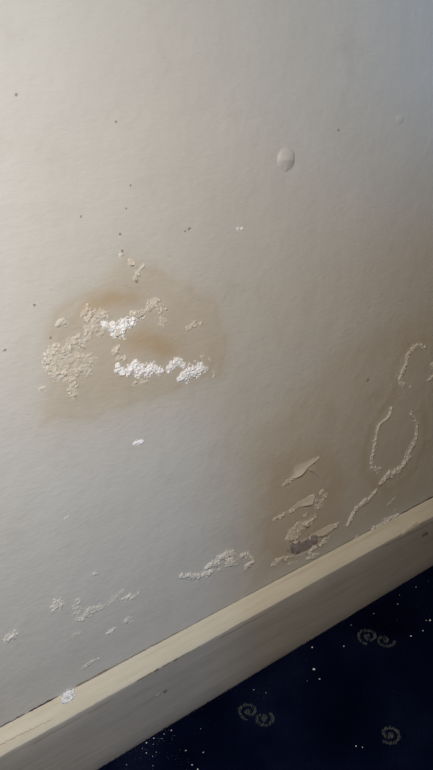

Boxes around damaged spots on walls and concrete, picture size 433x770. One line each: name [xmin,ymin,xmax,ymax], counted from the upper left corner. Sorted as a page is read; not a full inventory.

peeling [39,297,216,401]
peeling [271,406,419,566]
peeling [179,548,256,582]